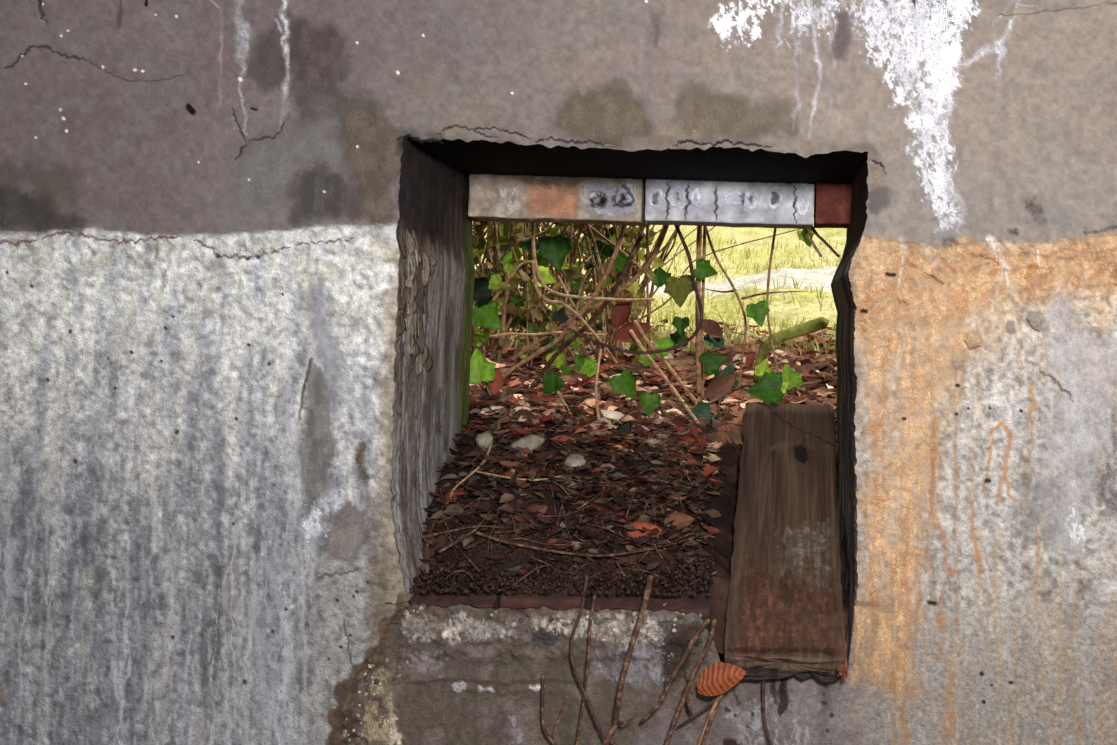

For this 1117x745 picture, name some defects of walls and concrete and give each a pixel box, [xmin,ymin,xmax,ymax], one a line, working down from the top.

crack [5,0,87,68]
damp [0,167,79,233]
crack [232,108,284,160]
damp [710,0,1012,236]
rust [851,235,1117,692]
damp [212,488,345,745]
spalling [342,606,702,745]